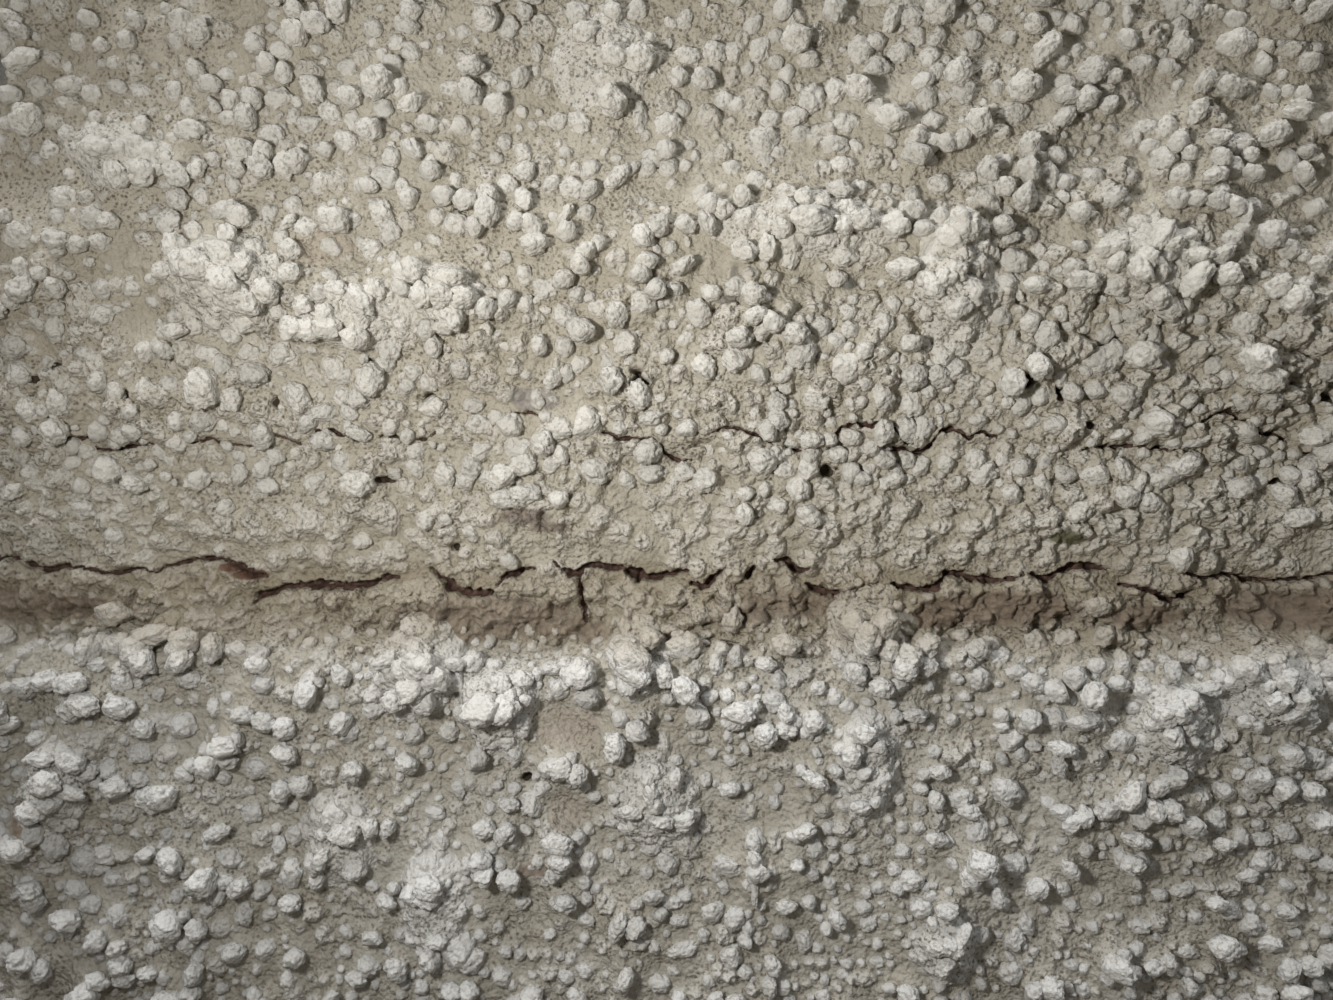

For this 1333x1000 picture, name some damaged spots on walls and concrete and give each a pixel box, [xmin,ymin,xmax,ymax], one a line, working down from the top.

crack [0,555,400,604]
crack [433,556,840,623]
crack [890,561,1333,602]